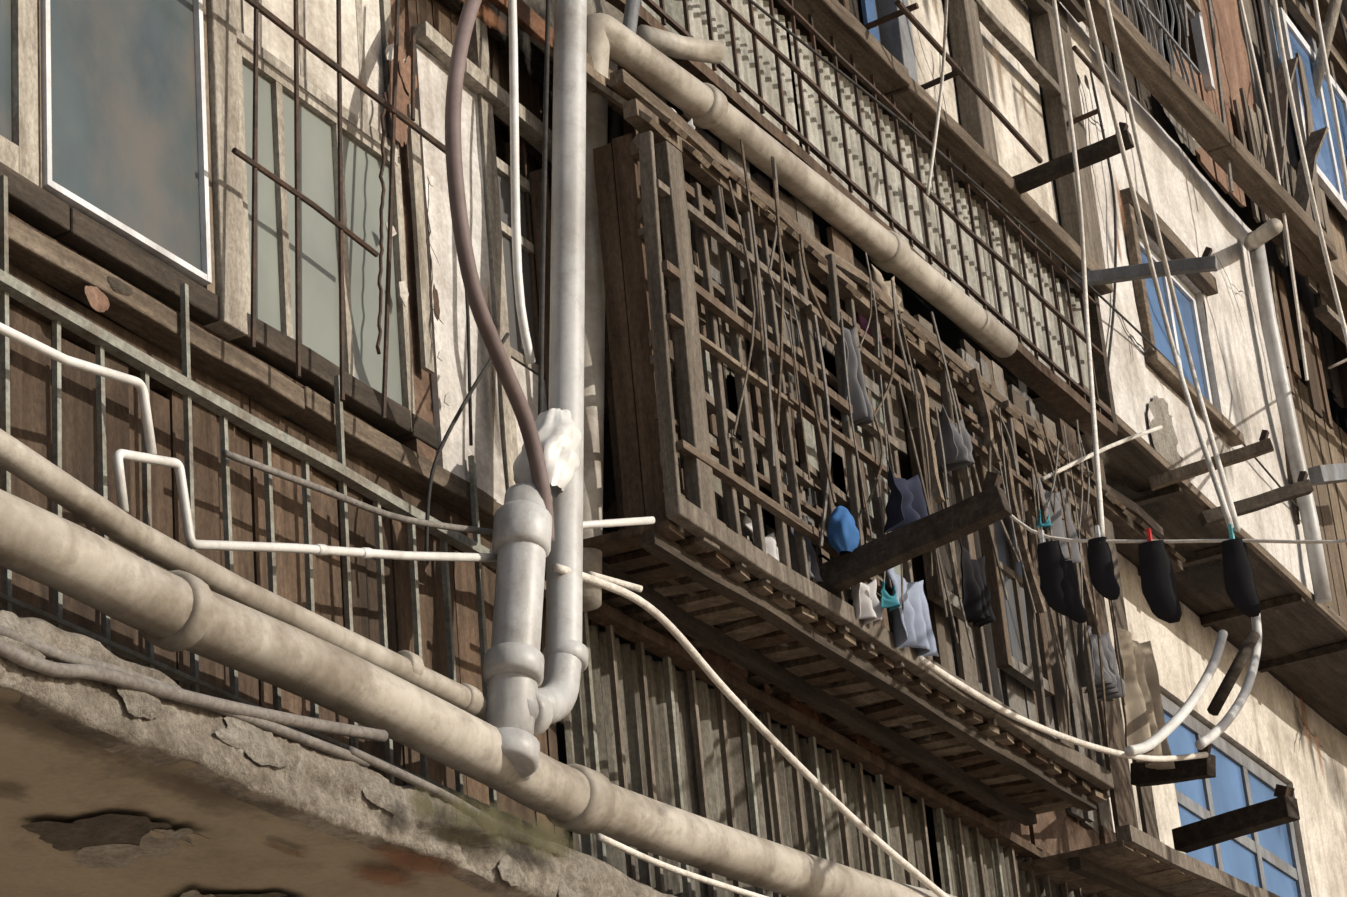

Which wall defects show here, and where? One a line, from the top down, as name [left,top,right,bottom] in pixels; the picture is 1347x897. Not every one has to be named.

rust [464,0,500,28]
spalling [0,610,676,897]